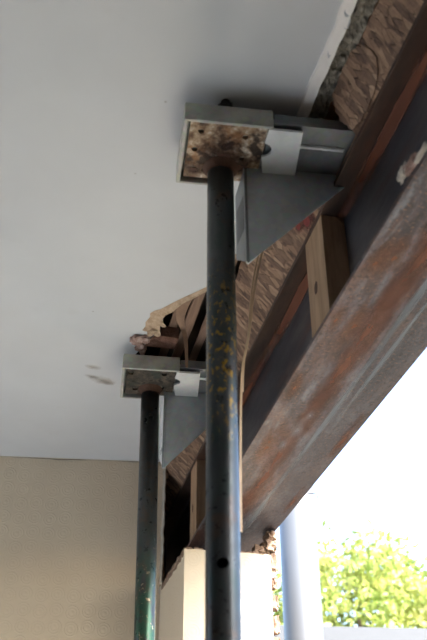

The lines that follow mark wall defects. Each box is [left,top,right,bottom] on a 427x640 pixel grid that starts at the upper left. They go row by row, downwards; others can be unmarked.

corrosion [351,48,427,199]
spalling [129,326,179,355]
corrosion [274,272,309,342]
corrosion [242,431,299,509]
spalling [240,531,280,640]